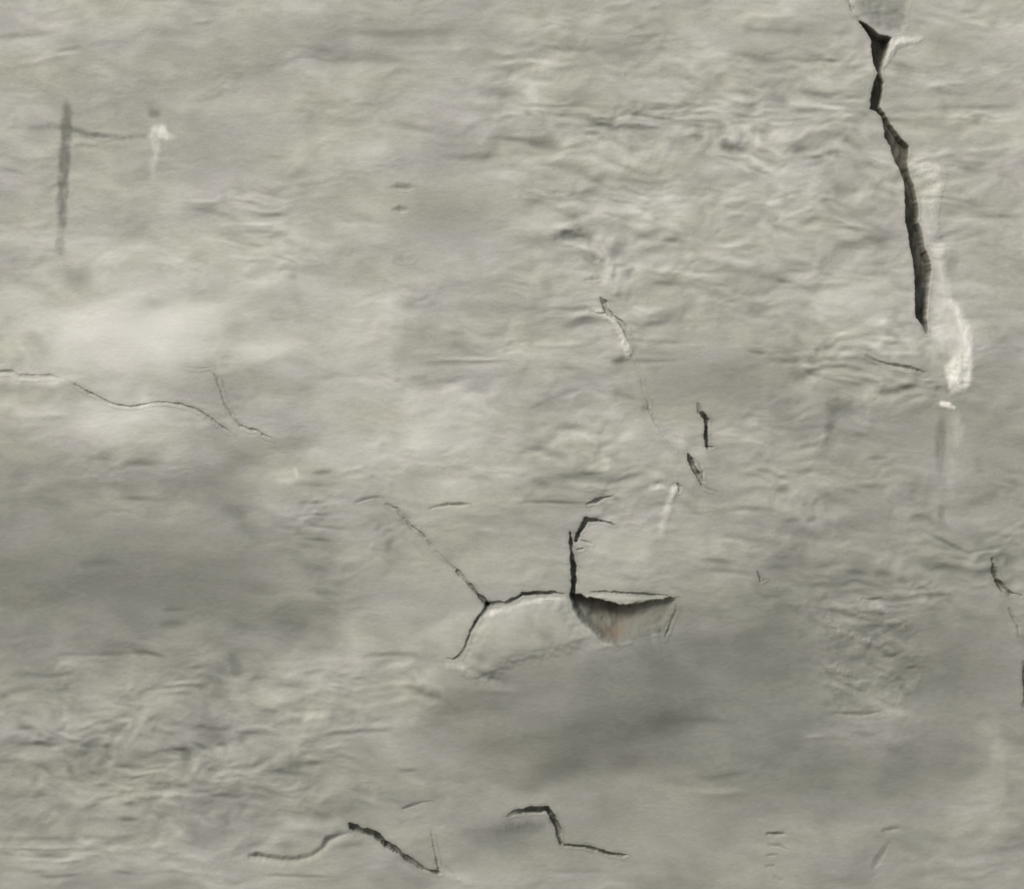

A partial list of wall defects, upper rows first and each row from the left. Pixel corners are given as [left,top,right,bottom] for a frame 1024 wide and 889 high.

water stain [55,99,175,257]
crack [844,0,947,336]
crack [0,364,276,442]
crack [589,294,723,496]
crack [354,493,618,663]
peeling [445,588,681,687]
crack [248,800,462,882]
crack [504,803,631,860]